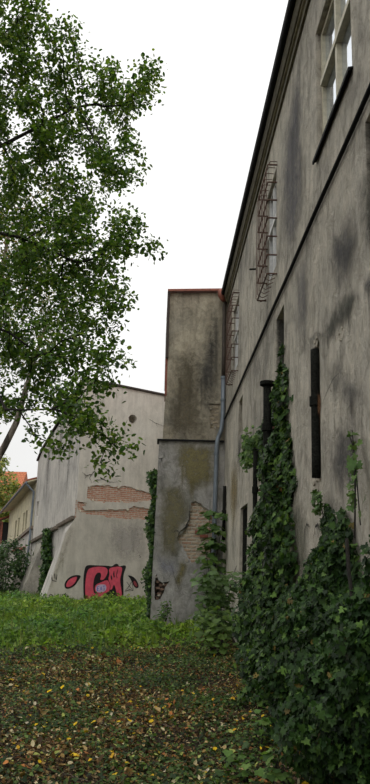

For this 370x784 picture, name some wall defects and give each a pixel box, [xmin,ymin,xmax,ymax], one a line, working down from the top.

damp [173,343,214,432]
peeling [75,483,152,520]
flaking render [176,501,212,564]